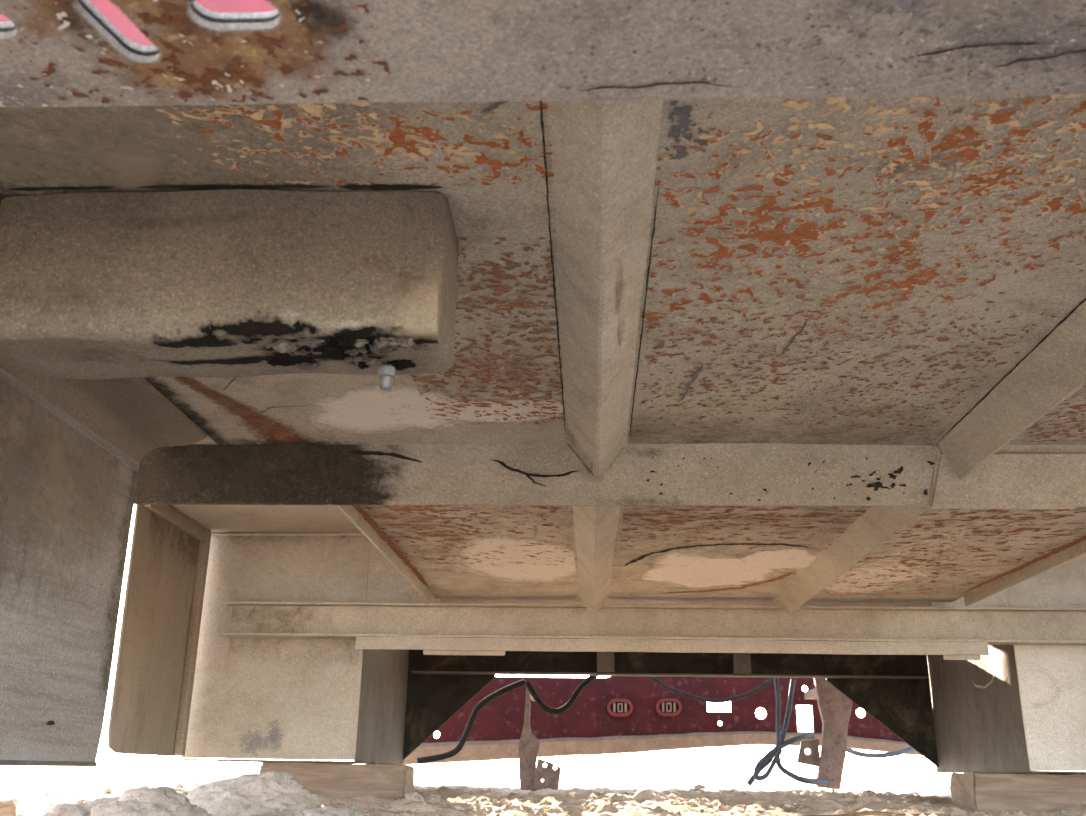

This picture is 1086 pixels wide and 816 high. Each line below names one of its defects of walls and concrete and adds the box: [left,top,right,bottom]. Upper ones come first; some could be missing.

rust [10,0,554,185]
crack [480,101,510,113]
crack [540,101,566,435]
rust [637,94,1086,429]
rust [411,237,566,424]
rust [145,377,341,445]
water stain [352,451,423,463]
crack [491,459,577,486]
spalling [834,466,906,501]
rust [353,505,573,588]
rust [621,506,871,550]
rust [825,508,1086,595]